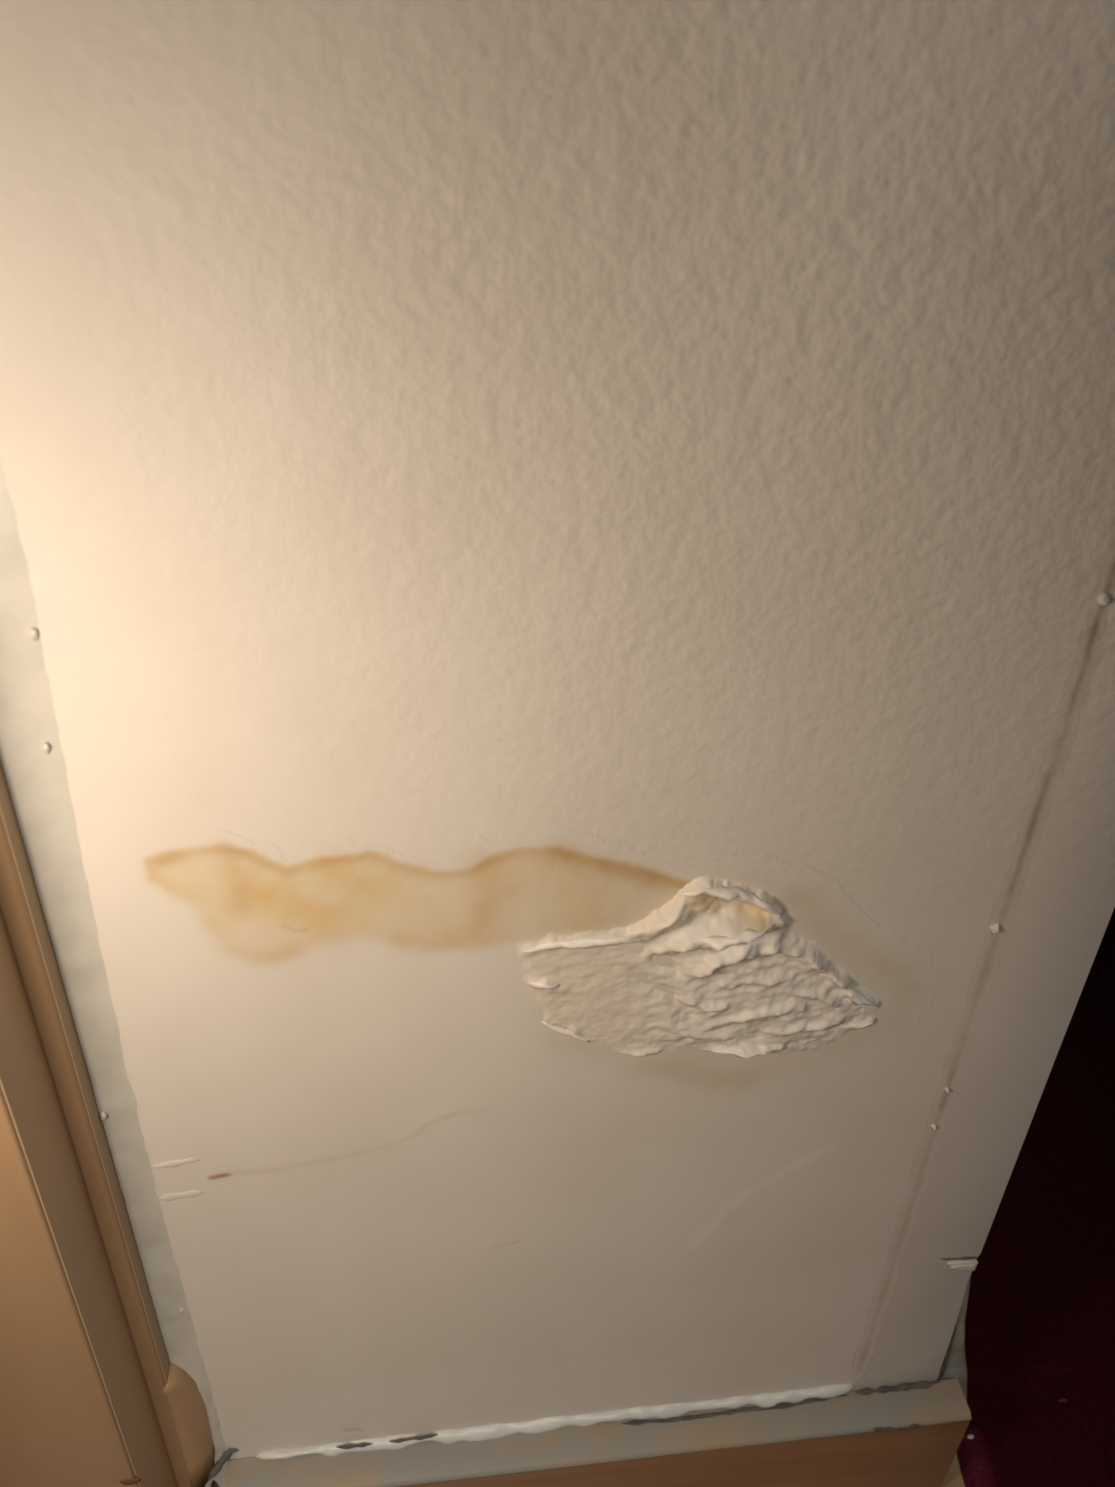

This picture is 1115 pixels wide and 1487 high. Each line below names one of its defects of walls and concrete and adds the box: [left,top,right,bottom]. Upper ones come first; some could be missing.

leakage [134,829,949,1109]